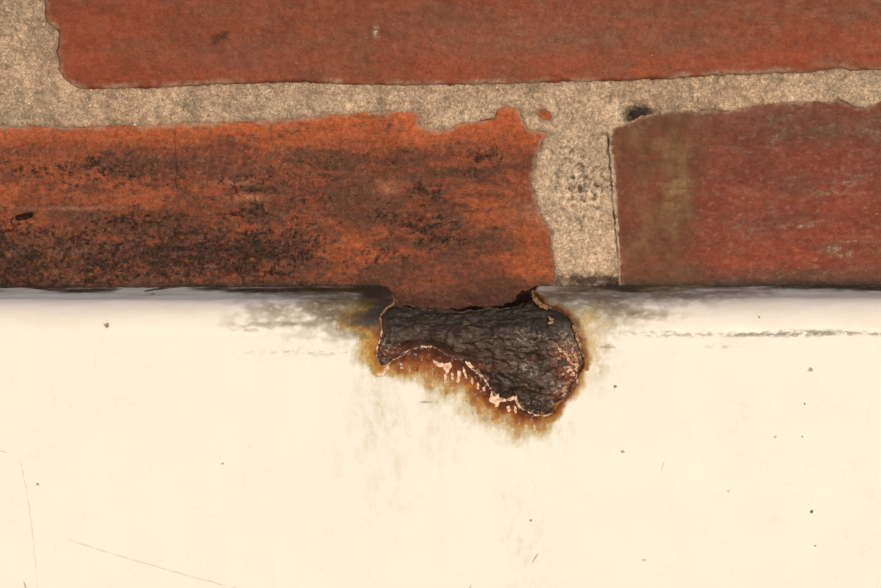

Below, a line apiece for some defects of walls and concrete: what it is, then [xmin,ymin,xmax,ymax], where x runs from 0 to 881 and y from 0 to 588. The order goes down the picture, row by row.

rust [336,290,597,438]